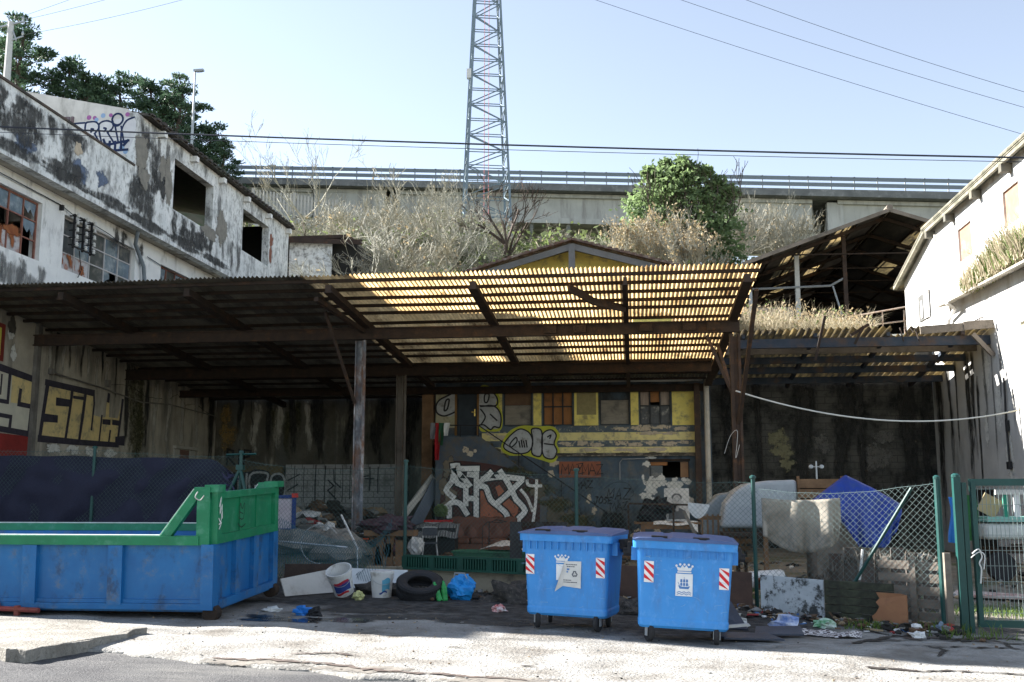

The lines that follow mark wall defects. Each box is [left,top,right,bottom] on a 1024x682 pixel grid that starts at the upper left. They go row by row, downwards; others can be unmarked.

damp [0,83,240,270]
damp [0,253,45,284]
damp [48,332,326,462]
damp [344,399,354,459]
damp [403,398,420,469]
peeling [529,425,694,527]
damp [720,385,733,489]
damp [752,332,1013,516]